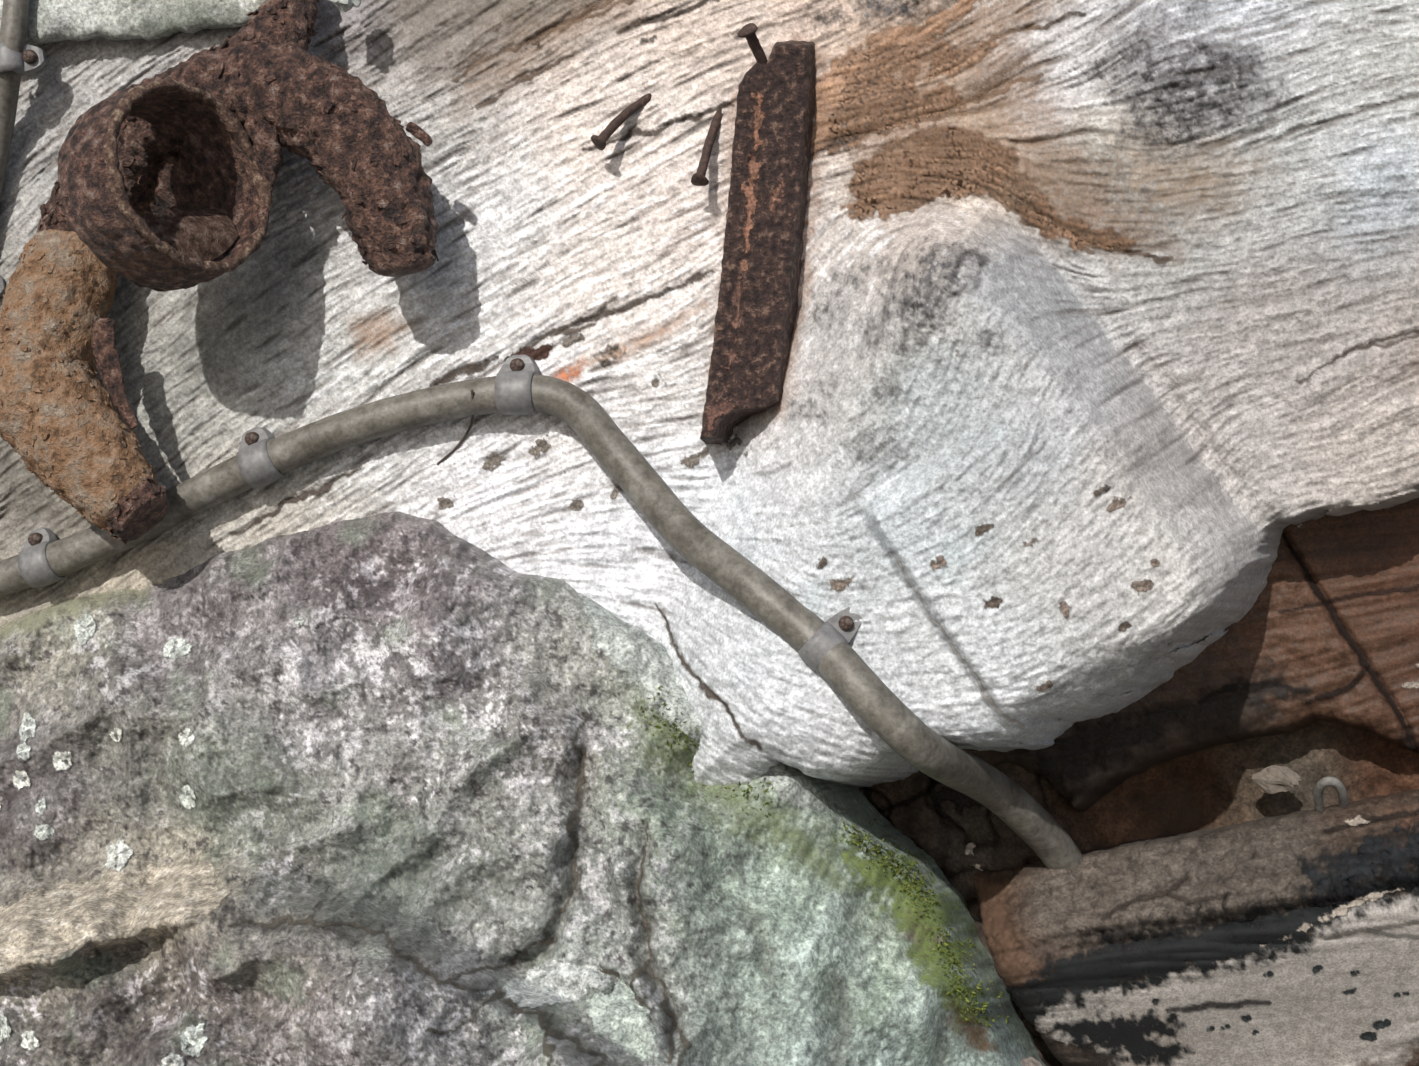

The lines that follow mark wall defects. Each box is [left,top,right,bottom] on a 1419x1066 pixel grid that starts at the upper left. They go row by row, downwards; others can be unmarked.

rust [196,0,345,78]
rust [36,178,66,233]
rust [309,124,417,265]
peeling [1345,815,1370,826]
peeling [1034,888,1419,1066]